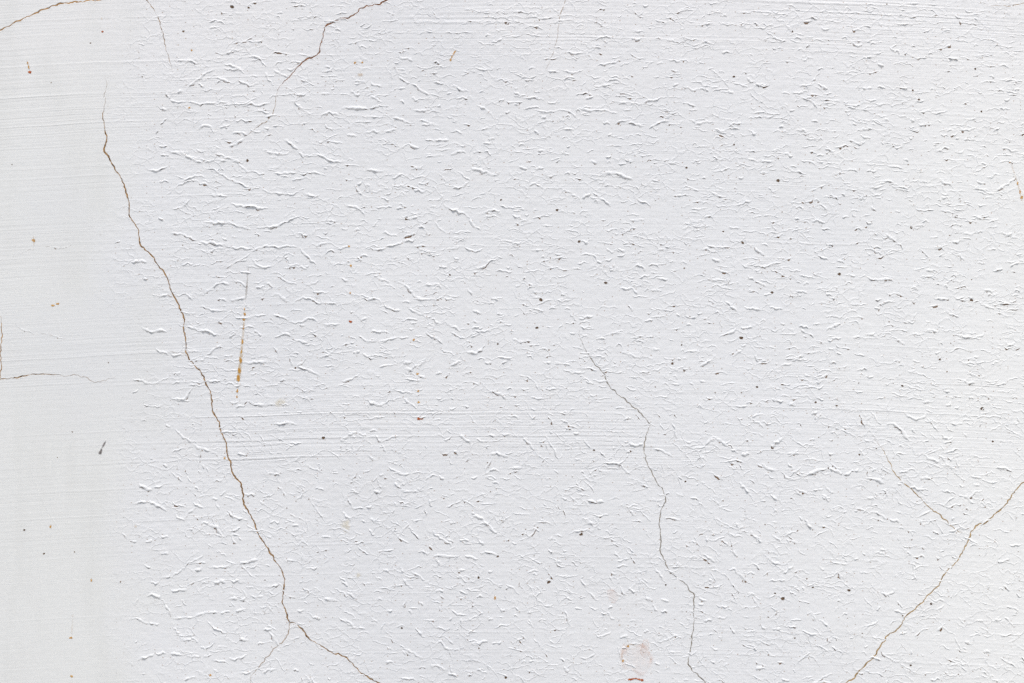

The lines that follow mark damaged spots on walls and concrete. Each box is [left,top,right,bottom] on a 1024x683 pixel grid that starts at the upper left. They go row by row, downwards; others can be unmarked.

crack [0,0,104,33]
crack [249,0,391,134]
crack [0,323,113,382]
crack [101,79,382,683]
crack [578,330,706,683]
crack [844,450,1024,683]